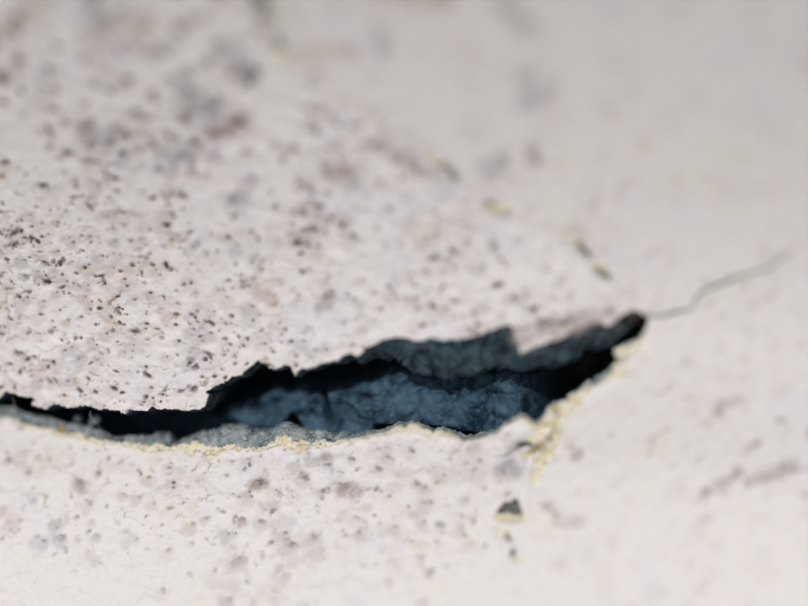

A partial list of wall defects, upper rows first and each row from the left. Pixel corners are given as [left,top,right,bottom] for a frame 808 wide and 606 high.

spalling [510,382,591,486]